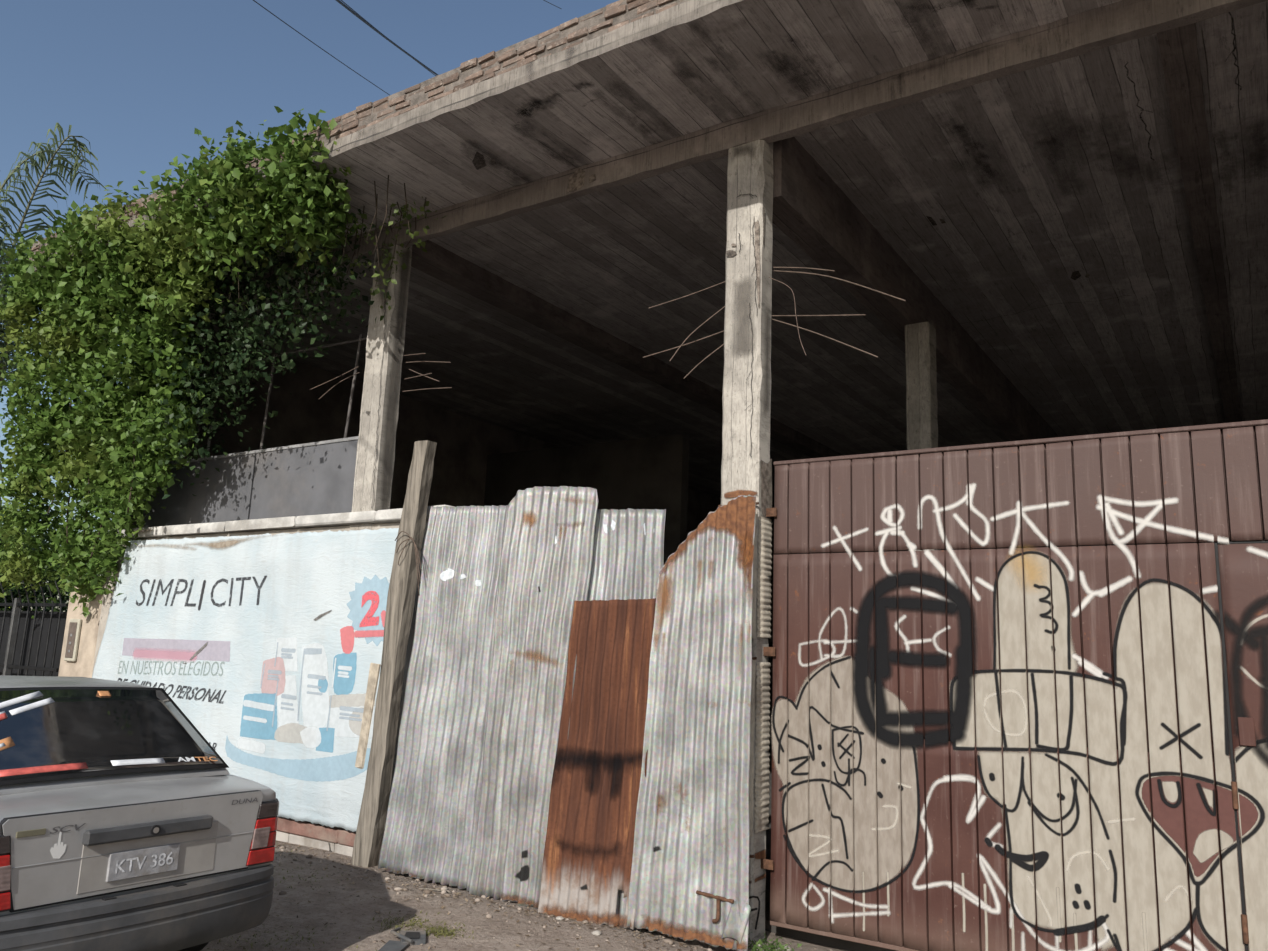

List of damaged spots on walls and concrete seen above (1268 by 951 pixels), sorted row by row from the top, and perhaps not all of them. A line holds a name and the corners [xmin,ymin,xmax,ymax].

crack [1225,12,1242,90]
crack [1124,63,1153,160]
rust [659,490,757,623]